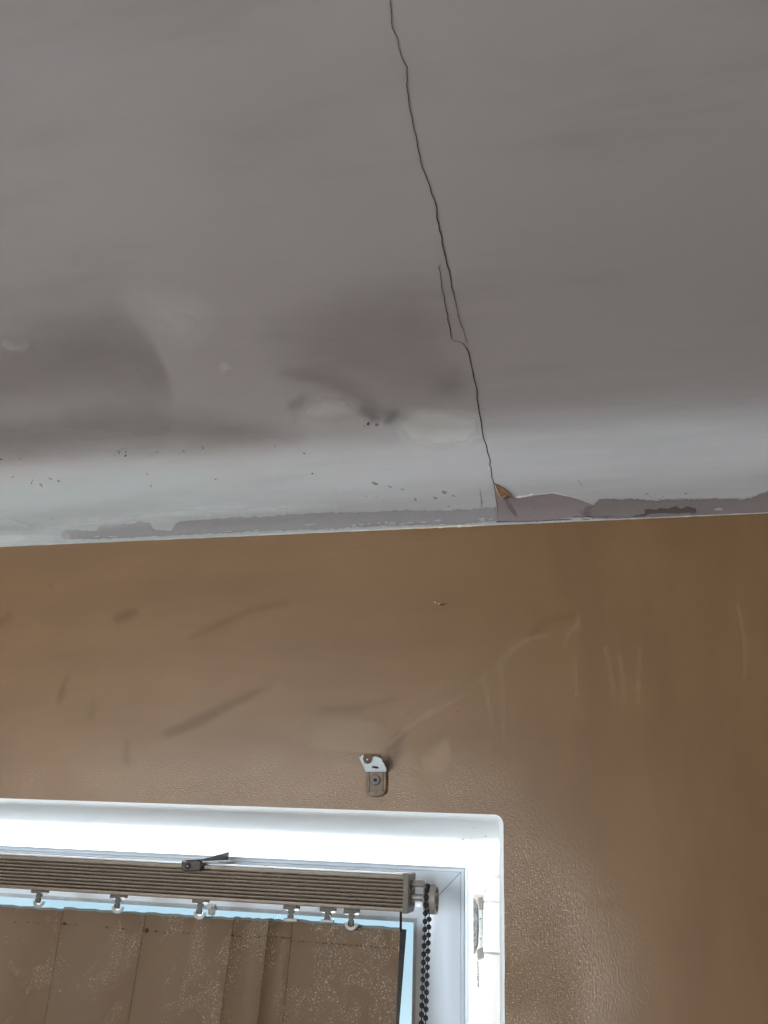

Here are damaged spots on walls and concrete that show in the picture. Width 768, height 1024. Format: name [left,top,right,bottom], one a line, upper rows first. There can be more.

crack [390,1,498,512]
peeling [62,488,768,539]